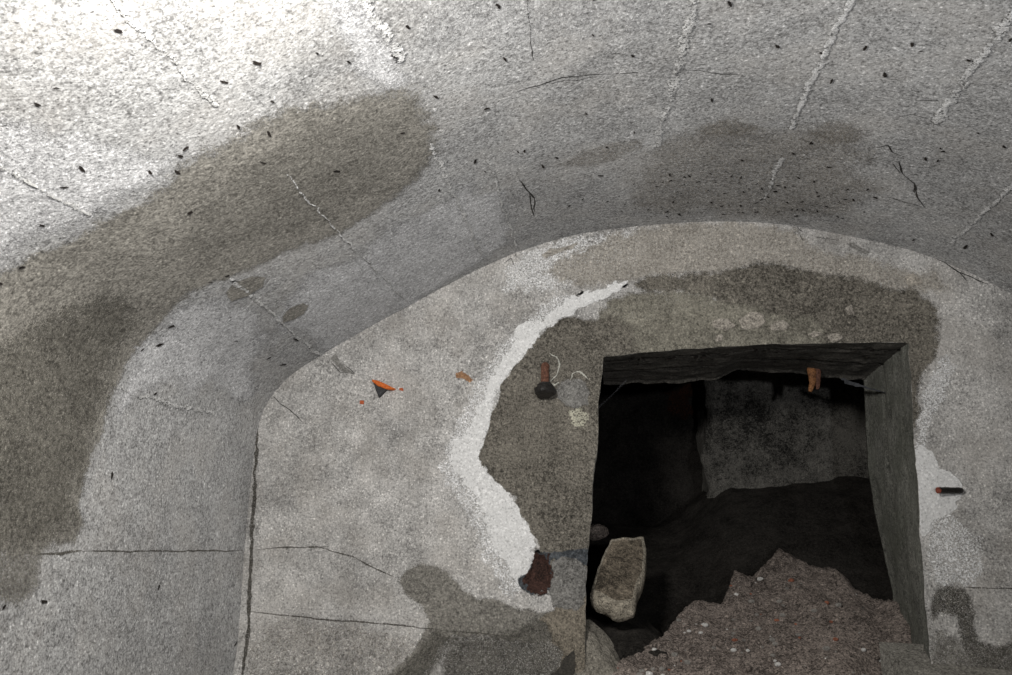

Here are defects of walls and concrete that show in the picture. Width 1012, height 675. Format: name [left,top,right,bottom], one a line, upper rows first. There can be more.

damp [0,0,703,610]
corrosion [518,548,588,596]
damp [237,228,1012,675]
damp [554,107,895,223]